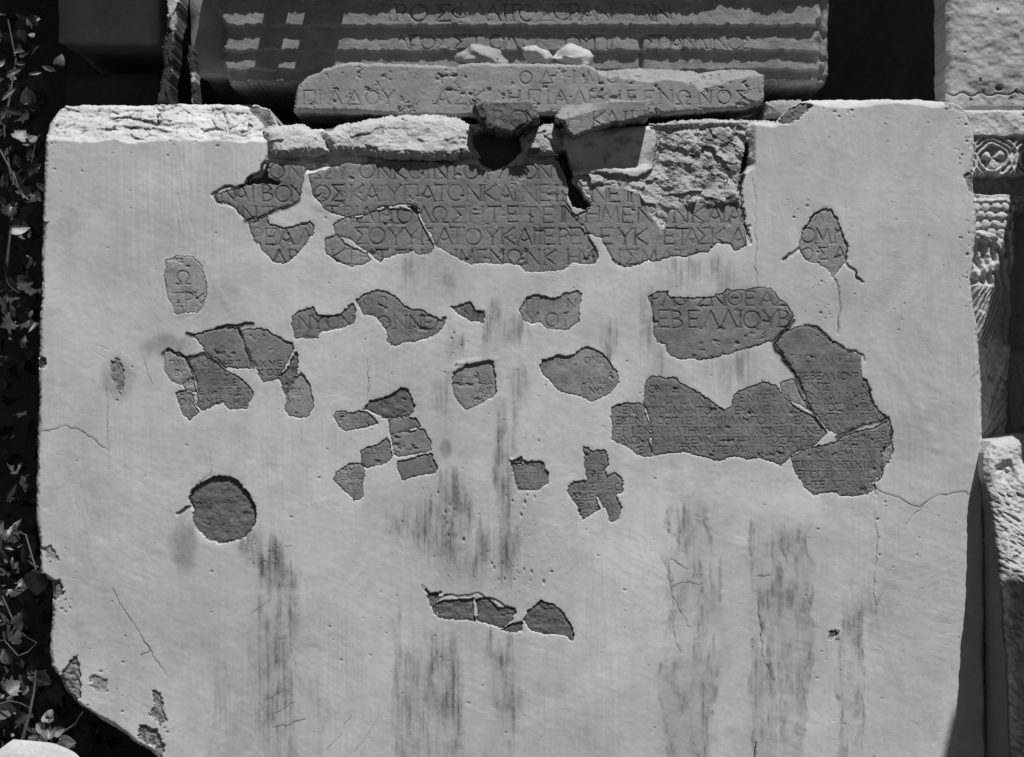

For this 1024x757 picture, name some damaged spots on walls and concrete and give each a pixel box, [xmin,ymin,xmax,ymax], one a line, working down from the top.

spalling [421,586,443,617]